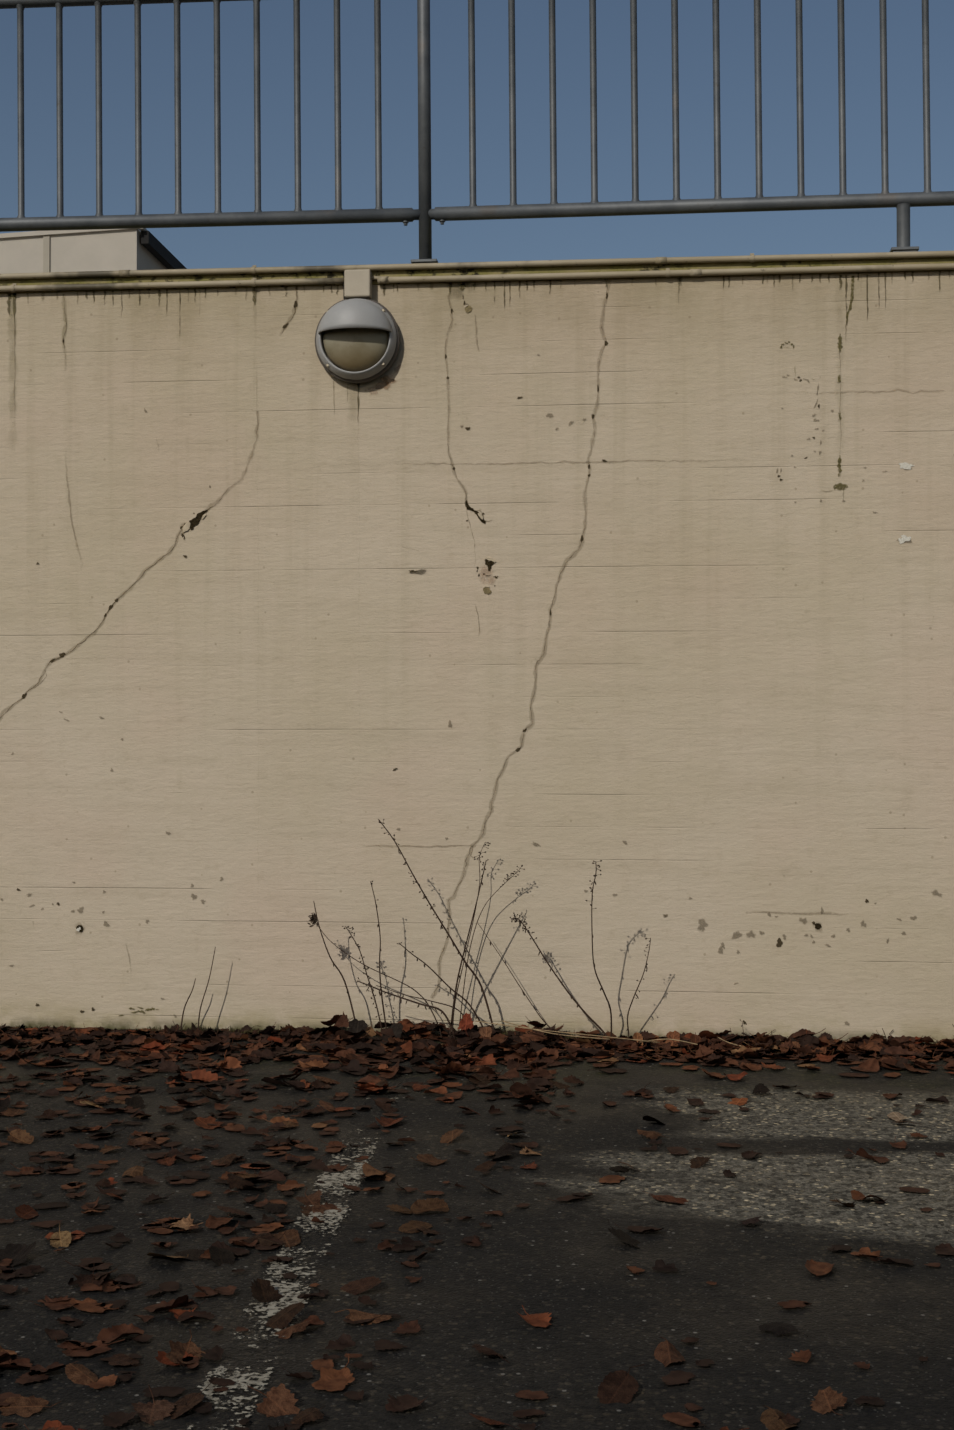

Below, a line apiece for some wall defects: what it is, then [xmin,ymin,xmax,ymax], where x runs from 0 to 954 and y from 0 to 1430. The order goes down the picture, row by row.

leakage [799,273,886,351]
leakage [833,457,848,490]
crack [0,490,227,718]